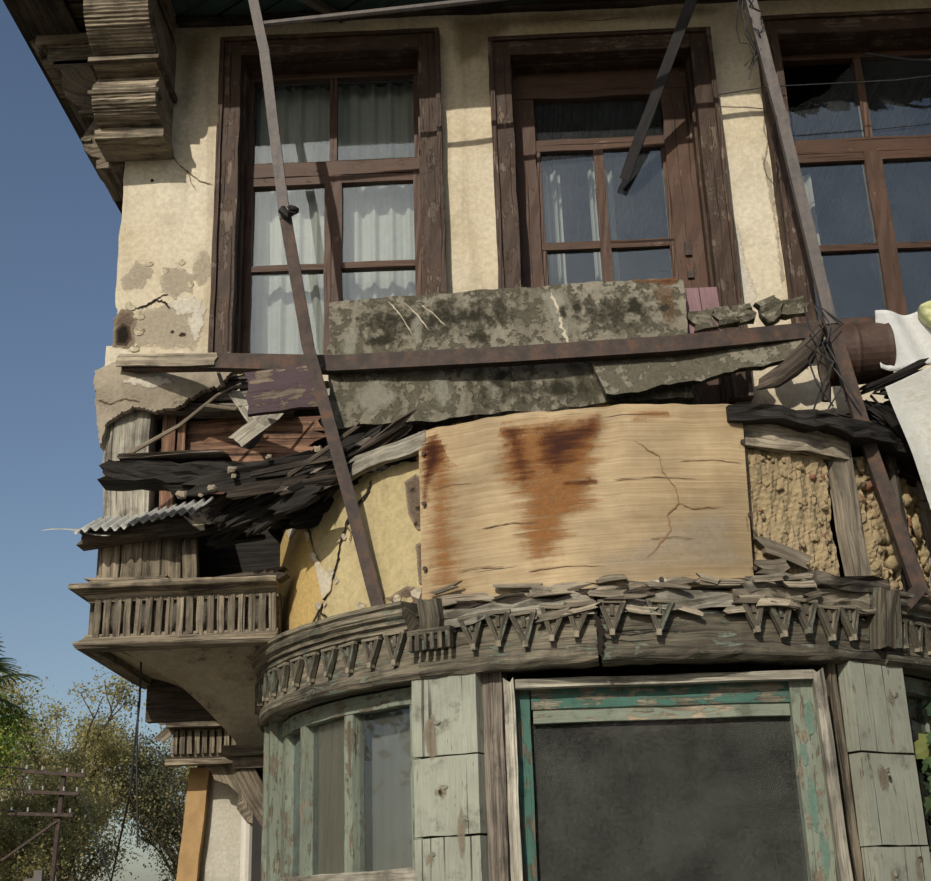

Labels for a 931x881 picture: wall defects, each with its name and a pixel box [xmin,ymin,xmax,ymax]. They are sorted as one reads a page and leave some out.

peeling [112,250,211,352]
leakage [344,294,513,354]
leakage [542,290,650,342]
leakage [356,380,395,412]
leakage [431,370,449,406]
leakage [475,367,595,407]
corrosion [421,435,460,584]
corrosion [501,415,600,558]
crack [615,460,738,480]
crack [317,479,372,620]
crack [532,564,594,572]
peeling [798,698,830,881]